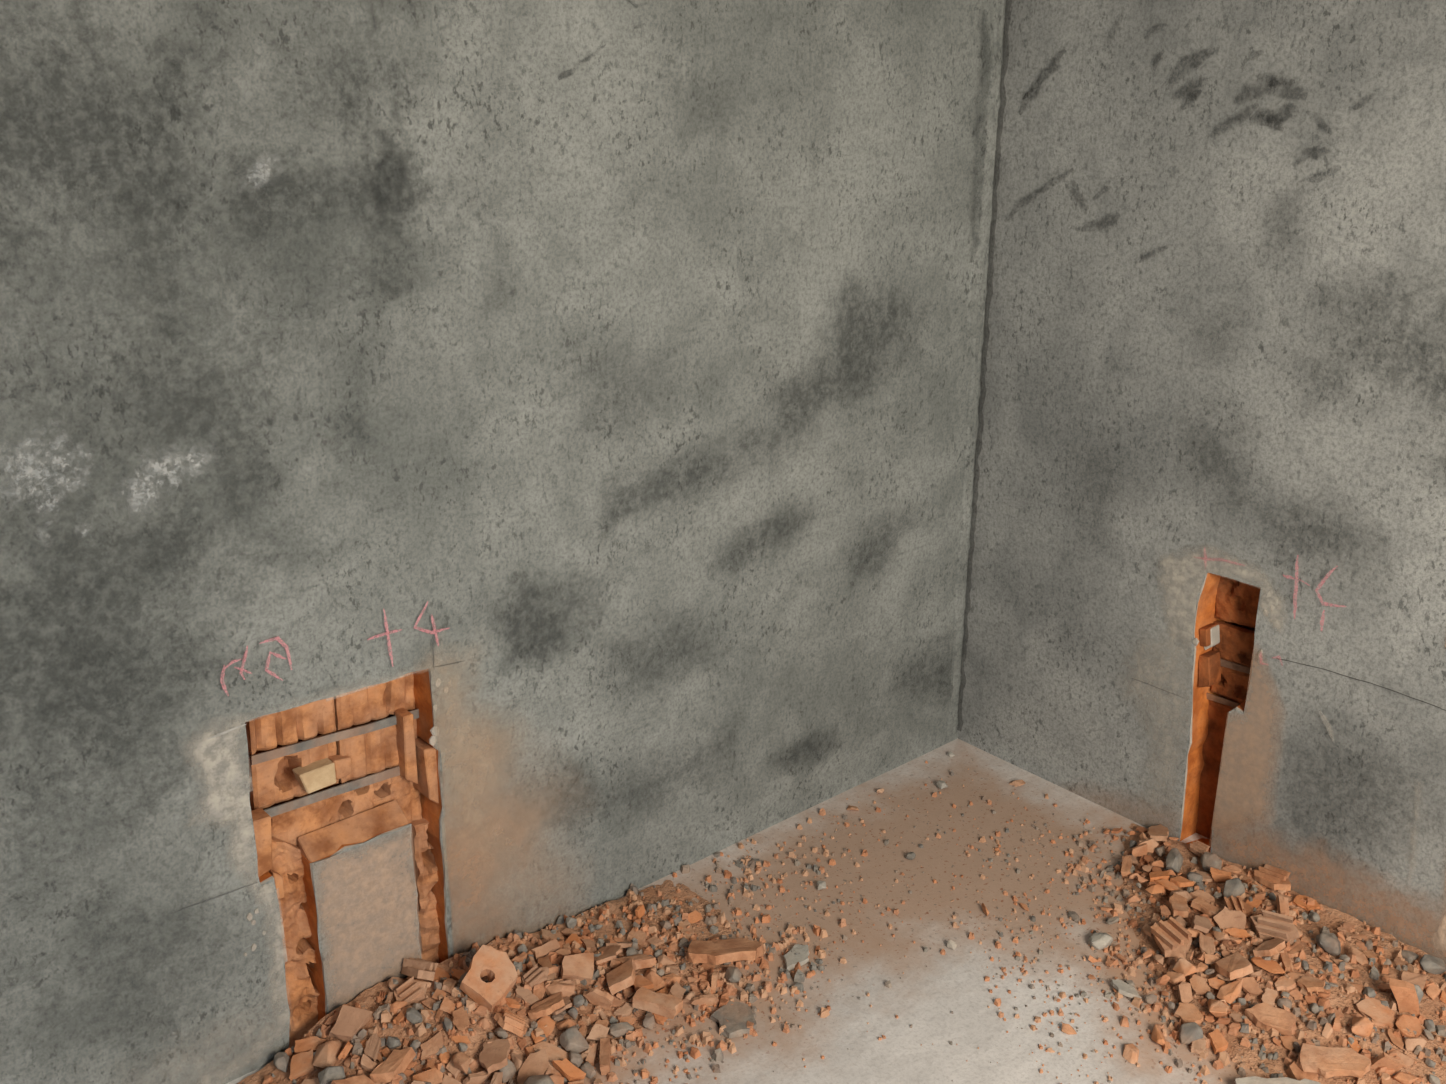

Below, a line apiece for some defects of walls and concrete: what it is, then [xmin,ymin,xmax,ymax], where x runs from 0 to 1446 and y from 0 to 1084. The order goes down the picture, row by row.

leakage [7,443,69,507]
leakage [131,454,199,504]
spalling [429,678,448,746]